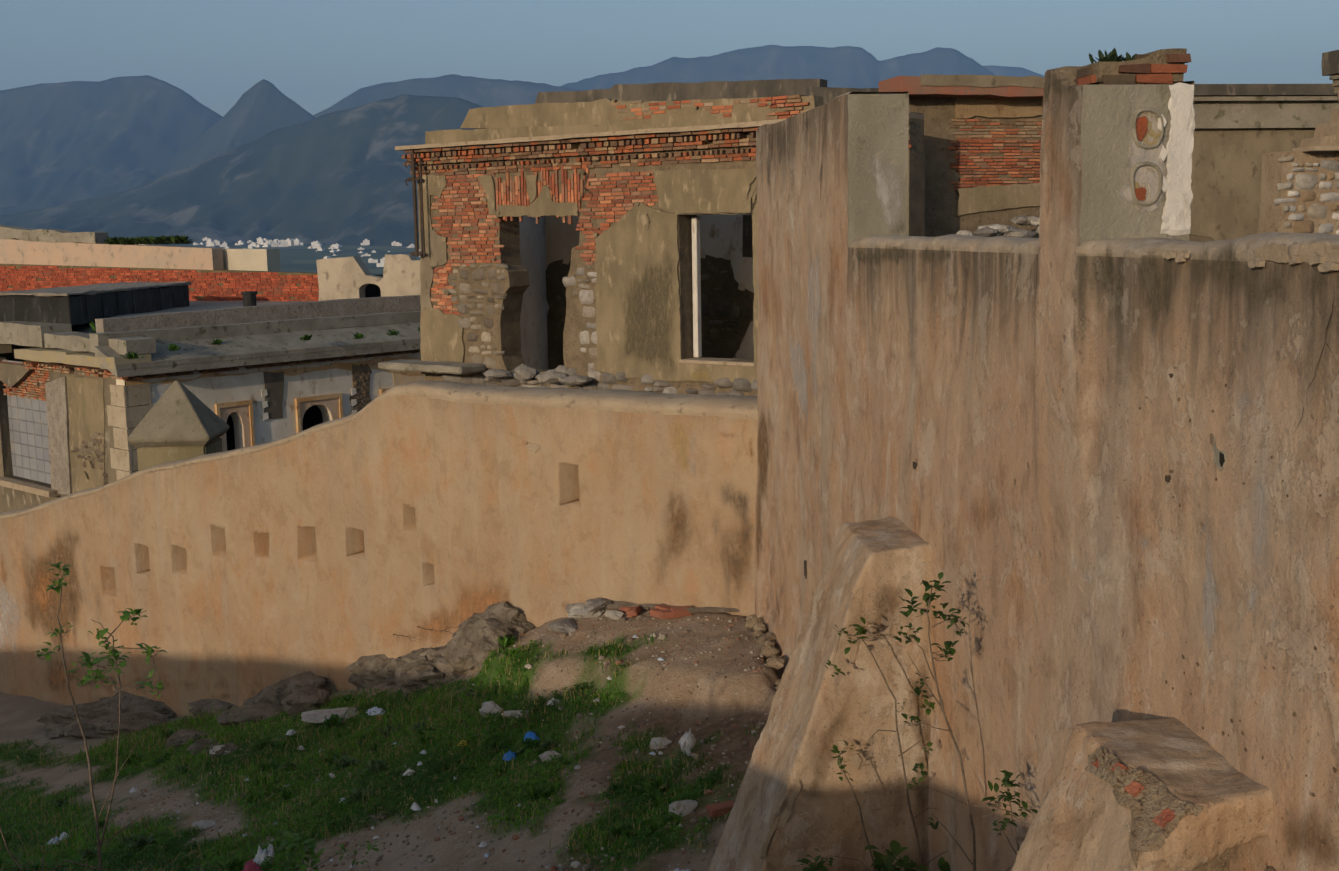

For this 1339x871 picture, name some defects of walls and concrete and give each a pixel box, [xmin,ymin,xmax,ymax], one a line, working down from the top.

flaking render [612,98,784,120]
flaking render [429,165,658,370]
spalling [1162,250,1190,263]
spalling [1248,242,1339,272]
crack [1293,282,1335,434]
leakage [0,537,78,643]
spalling [1088,747,1204,869]
spalling [1193,849,1230,871]